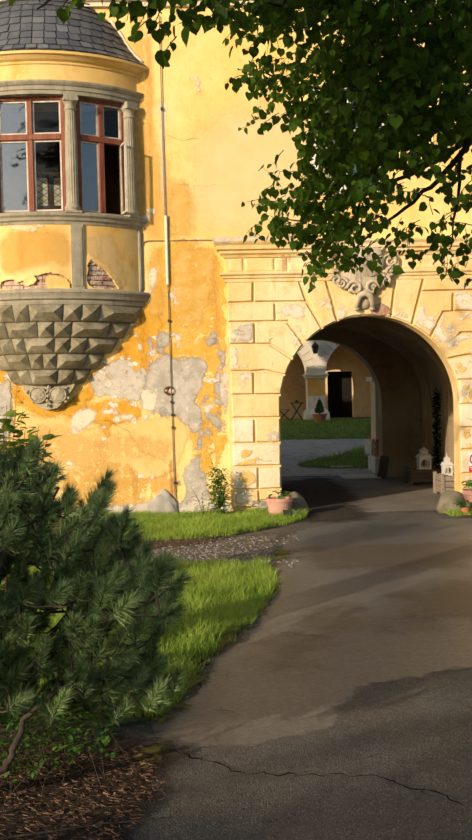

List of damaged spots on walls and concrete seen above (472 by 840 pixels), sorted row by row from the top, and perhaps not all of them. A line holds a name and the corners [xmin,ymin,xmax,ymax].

flaking render [1,273,72,289]
flaking render [87,260,117,289]
peeling [371,286,472,348]
flaking render [0,371,13,444]
flaking render [71,316,259,515]